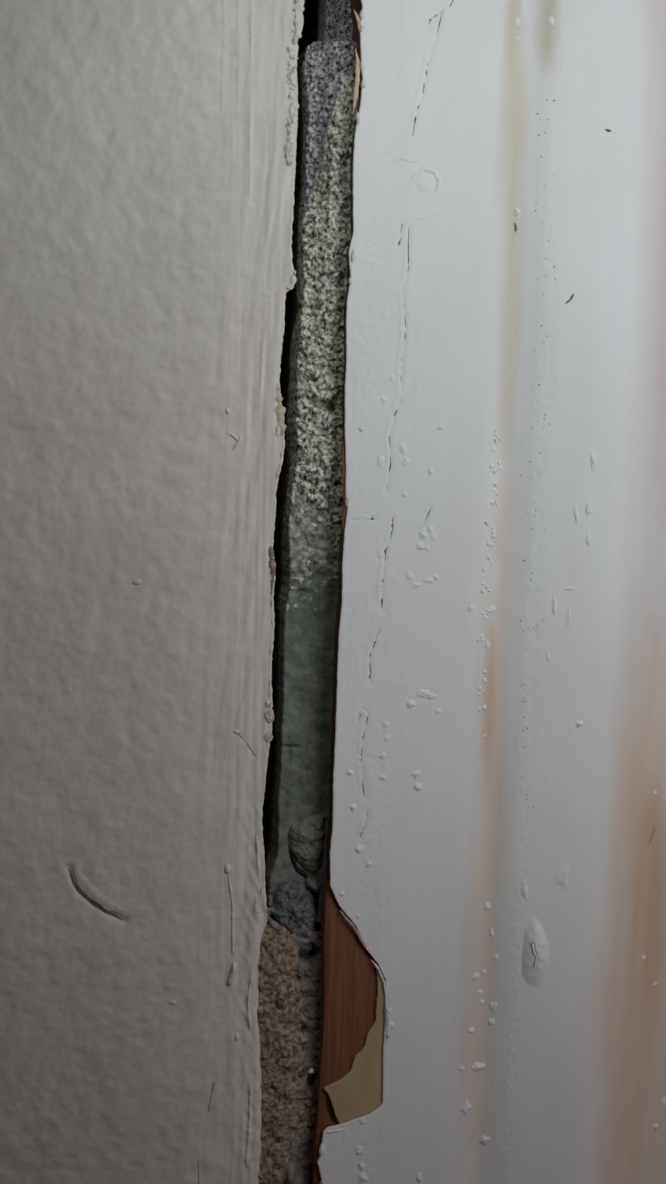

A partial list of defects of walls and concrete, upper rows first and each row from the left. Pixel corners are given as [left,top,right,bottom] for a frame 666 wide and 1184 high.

crack [297,0,314,57]
crack [409,0,453,137]
crack [350,506,431,683]
crack [287,842,319,916]
flaking render [252,833,391,1184]